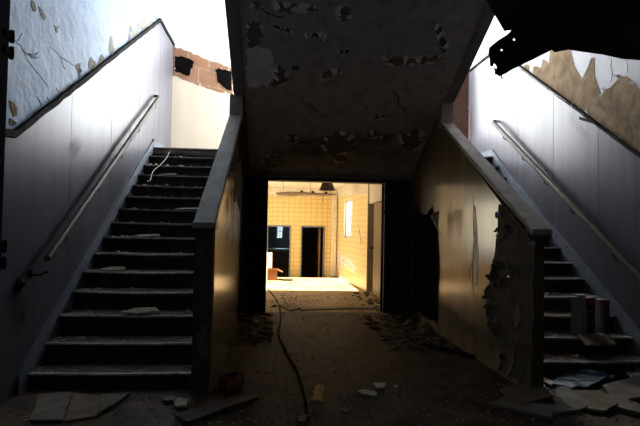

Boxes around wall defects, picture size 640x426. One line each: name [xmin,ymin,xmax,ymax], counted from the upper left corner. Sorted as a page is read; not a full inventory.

peeling [9,100,18,126]
crack [15,34,59,108]
peeling [76,36,115,79]
spalling [173,47,233,94]
peeling [244,20,301,89]
flaking render [523,50,640,153]
peeling [481,204,536,387]